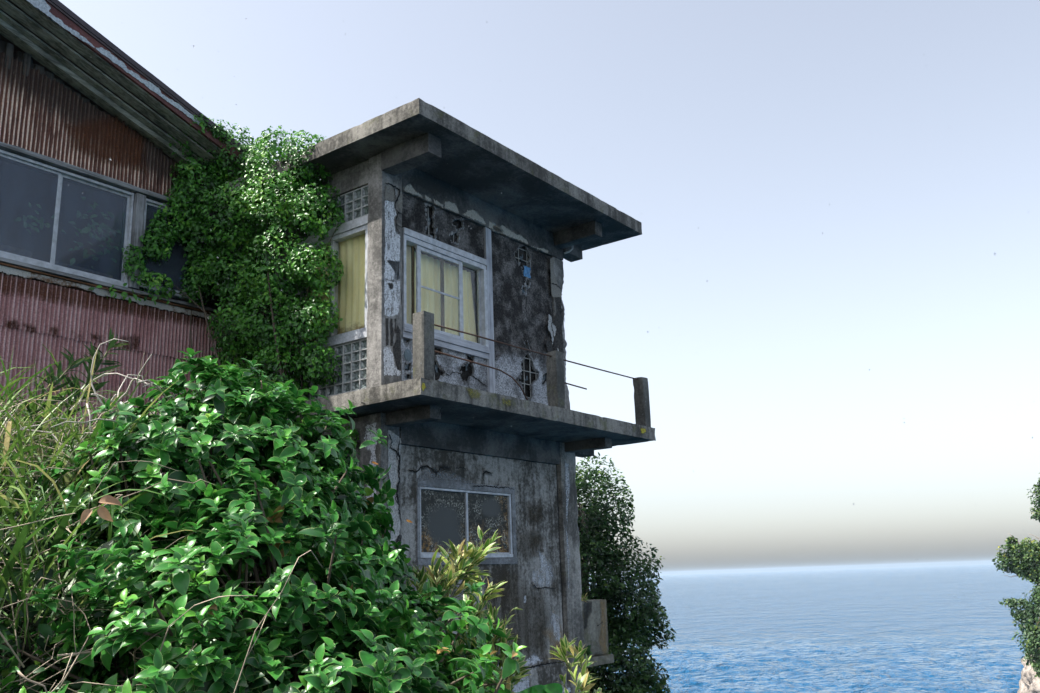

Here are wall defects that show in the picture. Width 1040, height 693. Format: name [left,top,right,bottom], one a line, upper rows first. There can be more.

peeling [27,0,201,125]
spalling [425,204,438,239]
peeling [383,185,413,380]
spalling [433,348,447,381]
spalling [459,355,476,385]
leakage [520,506,552,585]
leakage [491,572,560,693]